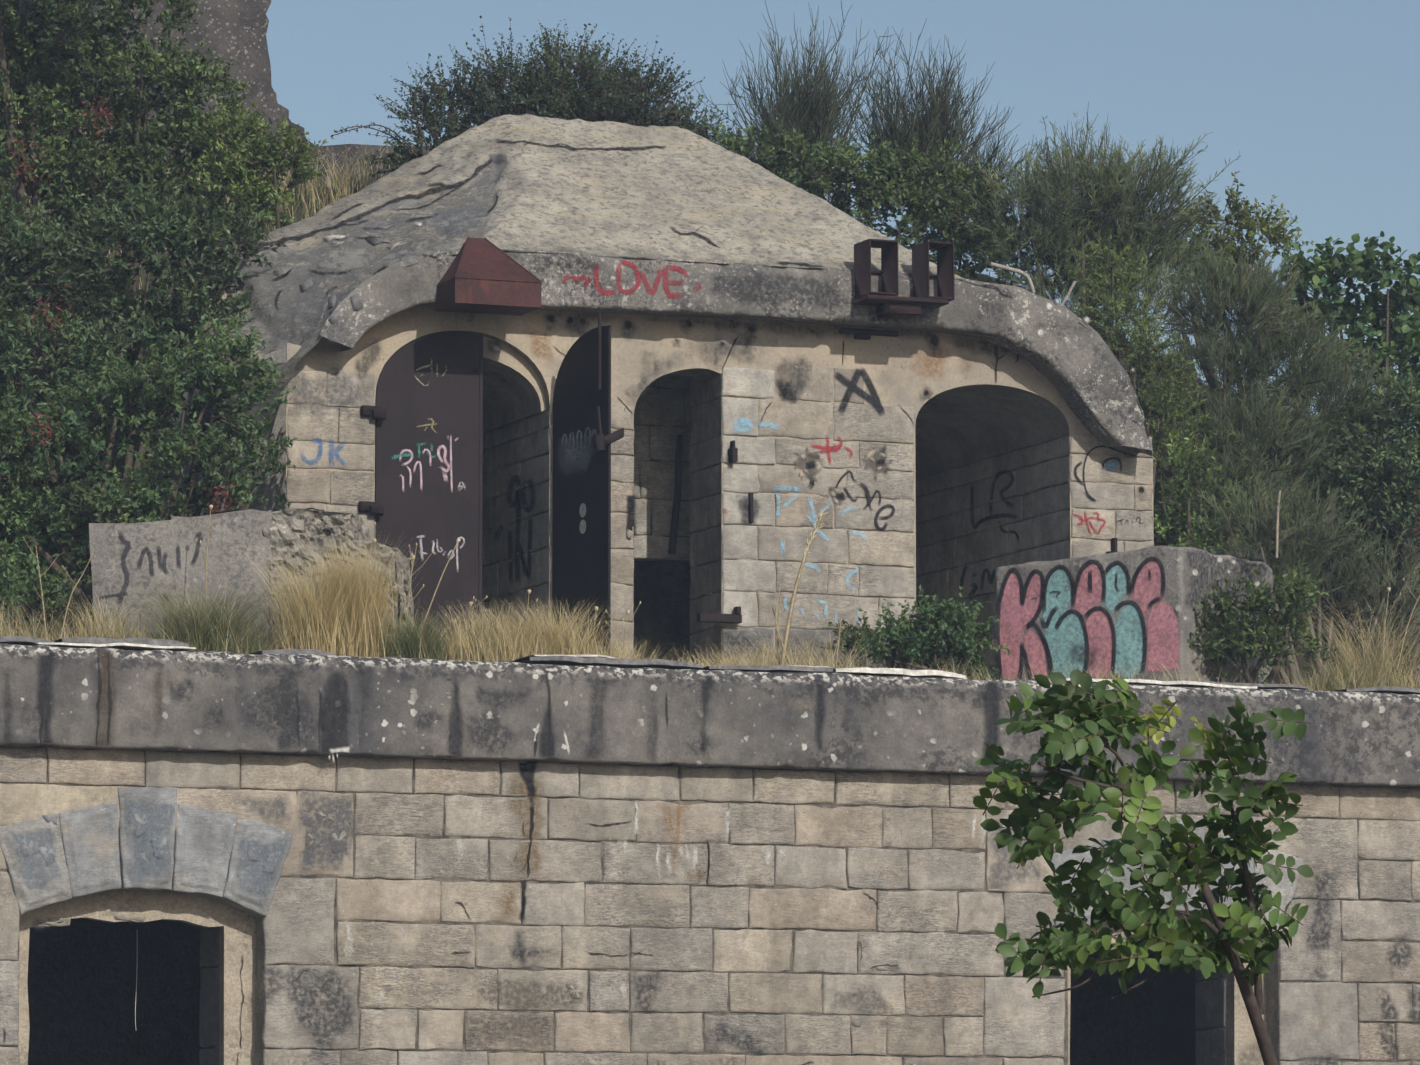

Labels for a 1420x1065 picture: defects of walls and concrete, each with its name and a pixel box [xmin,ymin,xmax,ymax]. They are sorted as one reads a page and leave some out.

crack [216,140,665,249]
damp [318,669,363,761]
damp [245,793,352,864]
damp [261,969,352,1045]